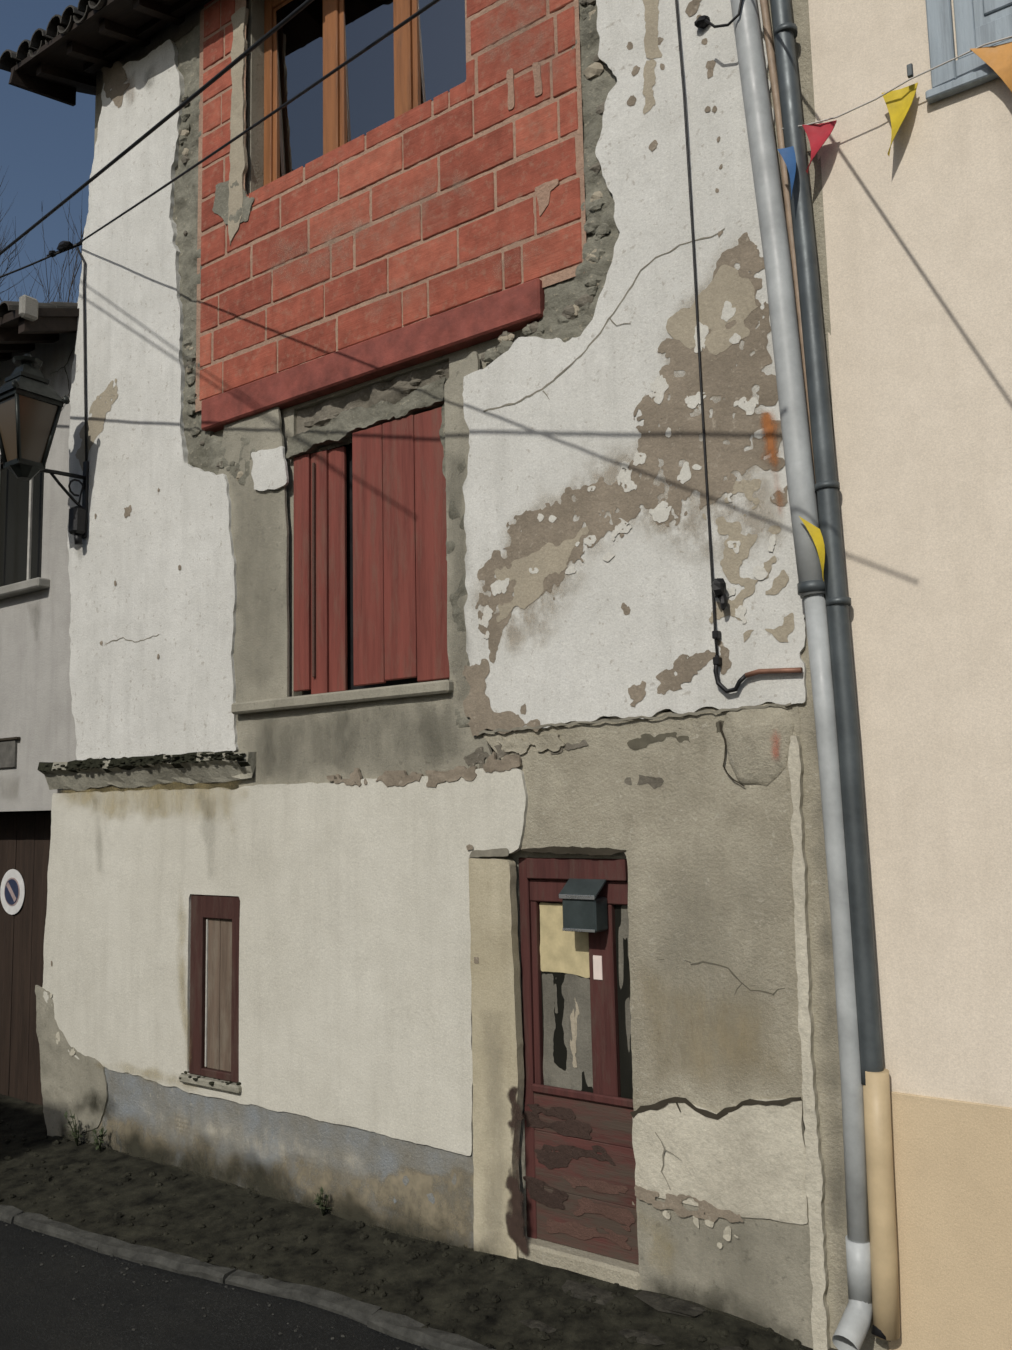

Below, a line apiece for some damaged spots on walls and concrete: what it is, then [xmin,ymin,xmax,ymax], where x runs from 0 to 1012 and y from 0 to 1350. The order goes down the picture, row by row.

spalling [685,0,701,20]
spalling [706,60,716,79]
spalling [480,0,665,363]
spalling [173,24,289,491]
crack [484,228,725,412]
peeling [327,231,794,789]
spalling [466,844,509,857]
crack [658,959,785,996]
leakage [62,1128,482,1253]
peeling [522,1104,615,1209]
spalling [632,1185,743,1249]
crack [630,1097,802,1190]